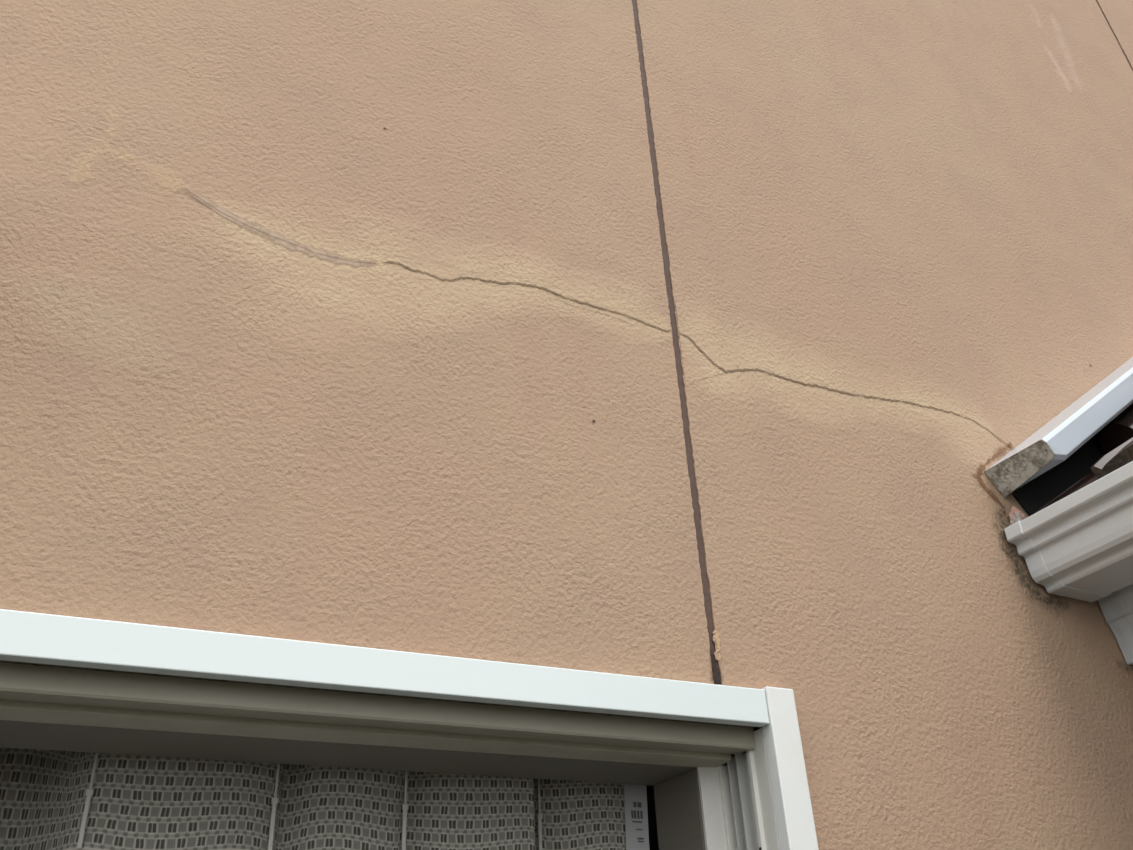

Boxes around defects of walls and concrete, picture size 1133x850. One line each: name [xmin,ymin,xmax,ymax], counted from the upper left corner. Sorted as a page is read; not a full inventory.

crack [191,193,1007,444]